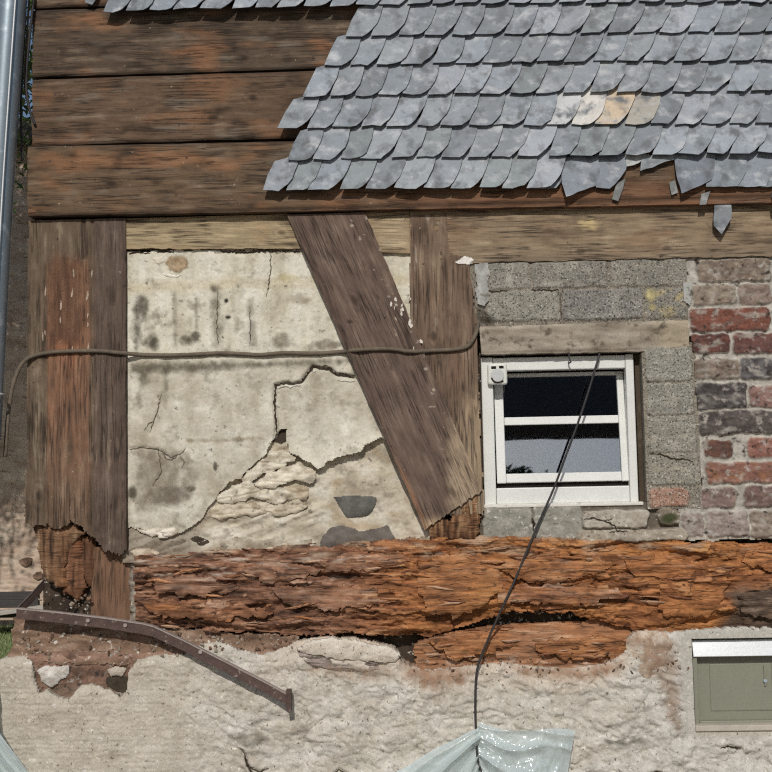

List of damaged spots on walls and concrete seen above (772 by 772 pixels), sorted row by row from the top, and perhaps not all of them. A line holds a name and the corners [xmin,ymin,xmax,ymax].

crack [129,247,172,255]
crack [214,248,300,297]
crack [273,365,355,436]
crack [130,394,186,486]
spalling [122,429,429,563]
spalling [33,650,134,698]
crack [242,750,269,772]